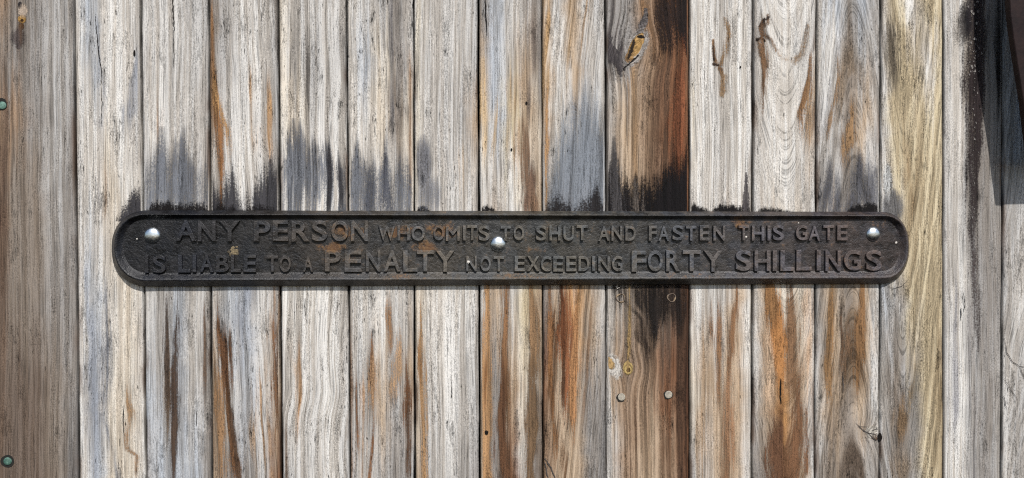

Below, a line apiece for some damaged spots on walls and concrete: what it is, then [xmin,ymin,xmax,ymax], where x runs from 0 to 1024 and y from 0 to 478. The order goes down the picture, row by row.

leakage [116,120,439,221]
leakage [546,97,687,211]
leakage [613,285,687,371]